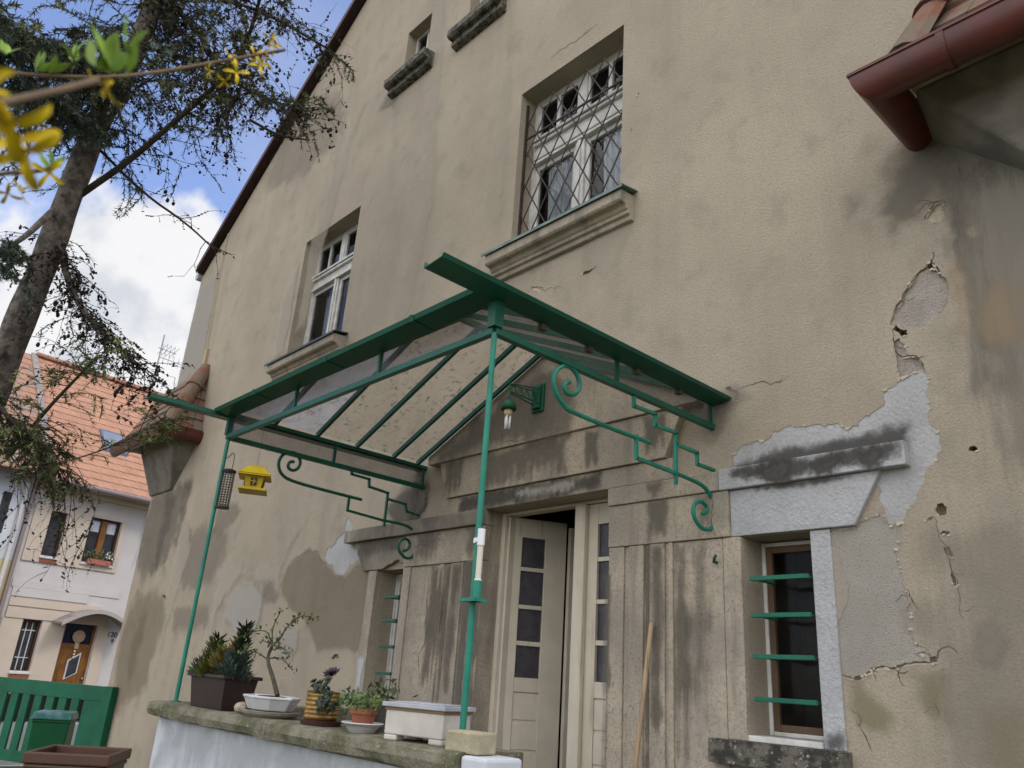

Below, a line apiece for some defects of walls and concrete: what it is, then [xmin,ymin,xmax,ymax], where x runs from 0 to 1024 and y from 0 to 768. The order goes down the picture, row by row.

water stain [916,144,1024,408]
water stain [202,563,281,649]
peeling [325,518,359,575]
water stain [388,483,428,522]
water stain [421,535,482,706]
water stain [441,375,601,512]
water stain [644,482,667,728]
water stain [675,571,690,701]
water stain [731,427,907,489]
spalling [732,261,949,681]
crack [842,645,957,685]
crack [927,516,973,618]